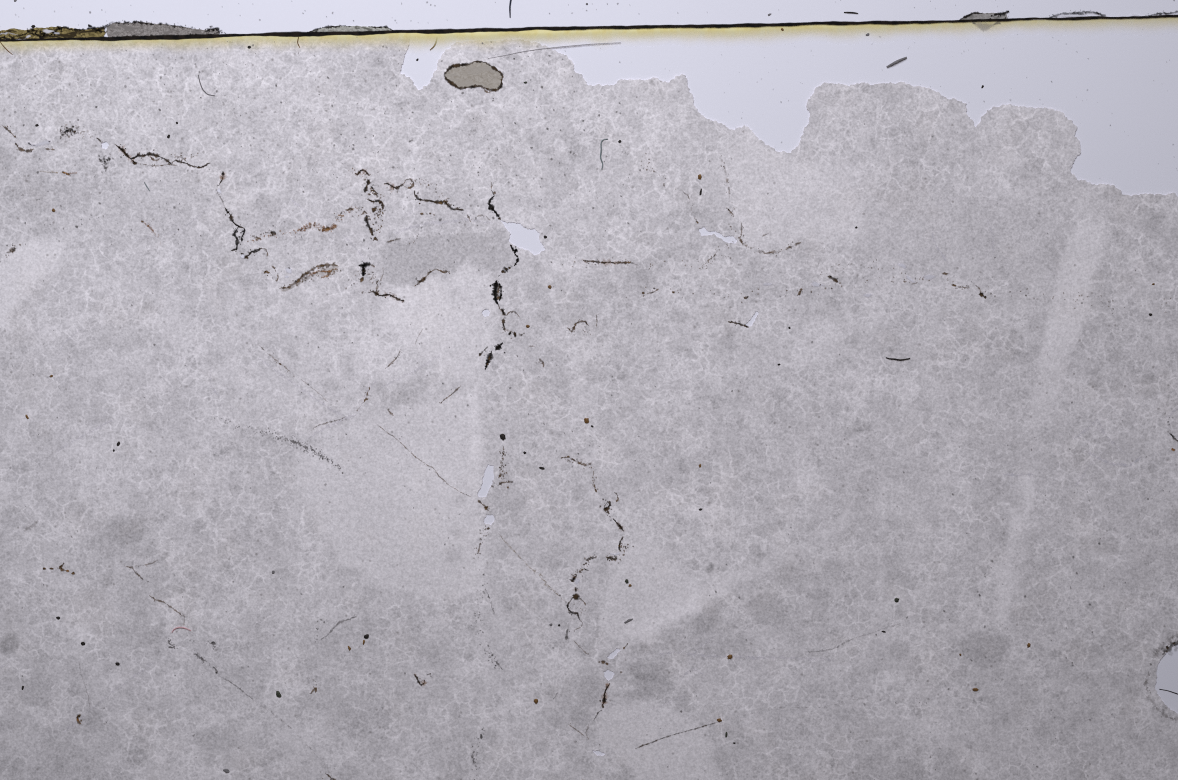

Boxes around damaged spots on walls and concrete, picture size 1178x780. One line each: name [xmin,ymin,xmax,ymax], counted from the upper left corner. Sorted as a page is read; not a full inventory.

crack [116,144,292,282]
crack [352,168,500,301]
crack [479,245,522,370]
crack [583,258,631,266]
crack [549,456,628,639]
crack [570,643,628,731]